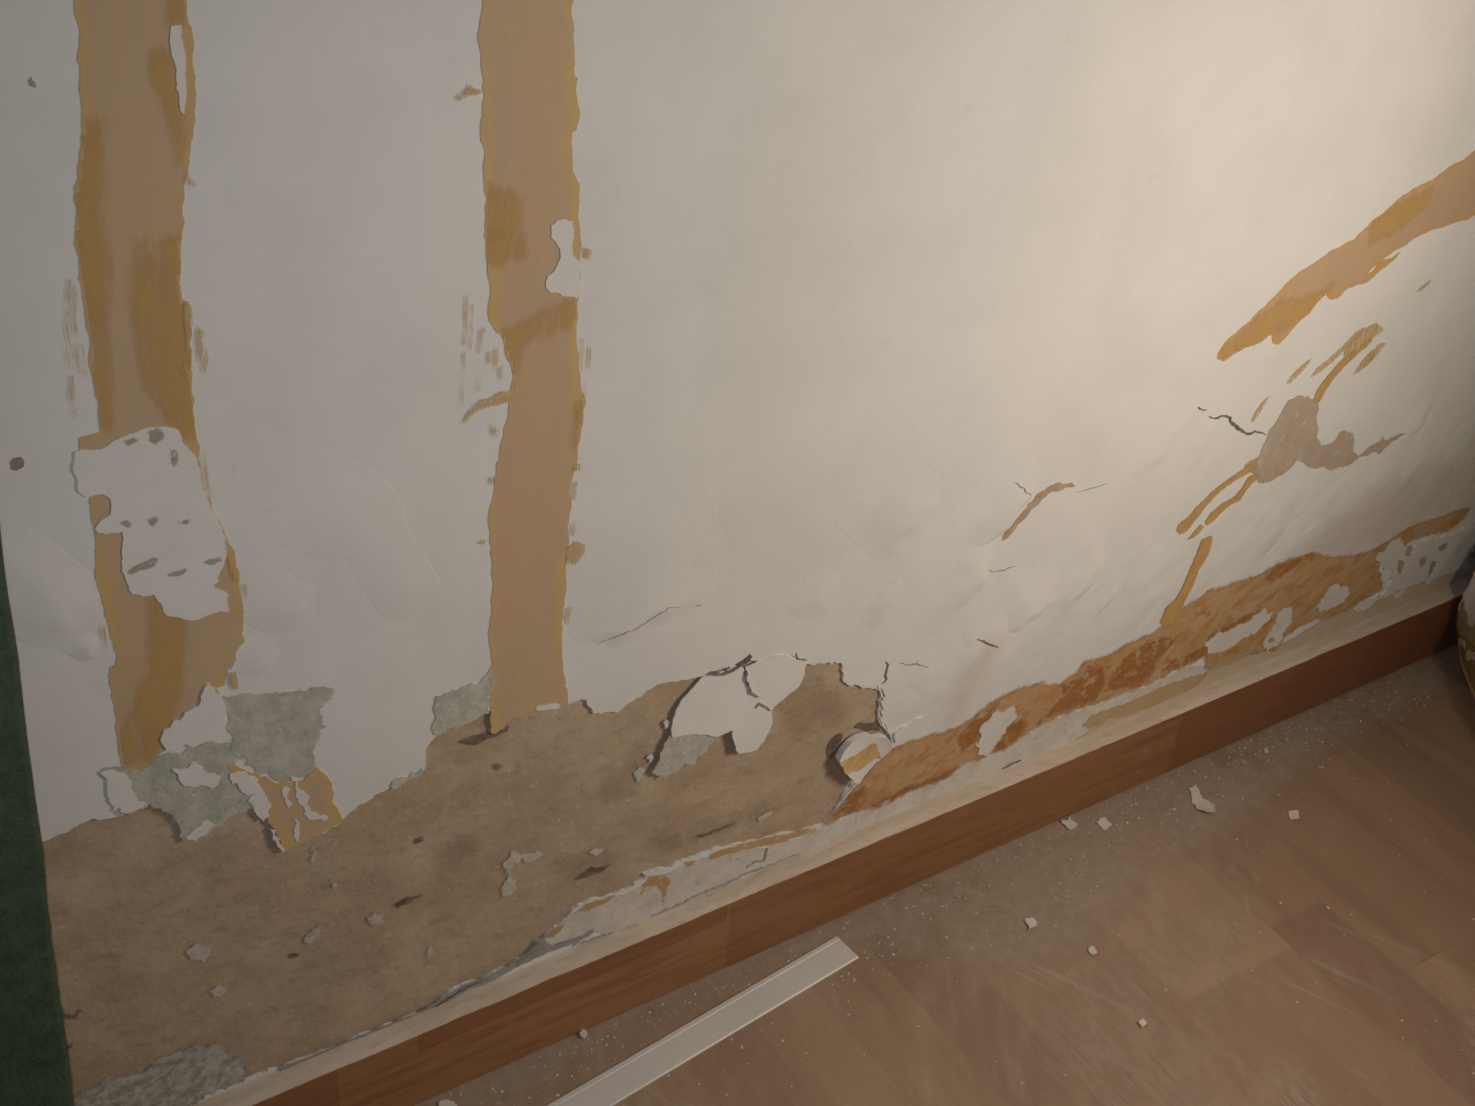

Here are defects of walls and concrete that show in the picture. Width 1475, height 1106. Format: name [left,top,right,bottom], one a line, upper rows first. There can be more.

peeling [1217,150,1475,361]
crack [1199,407,1266,435]
peeling [1003,482,1077,540]
flaking render [42,0,892,1106]
crack [709,654,771,711]
flaking render [1061,817,1078,830]
flaking render [1096,817,1112,831]